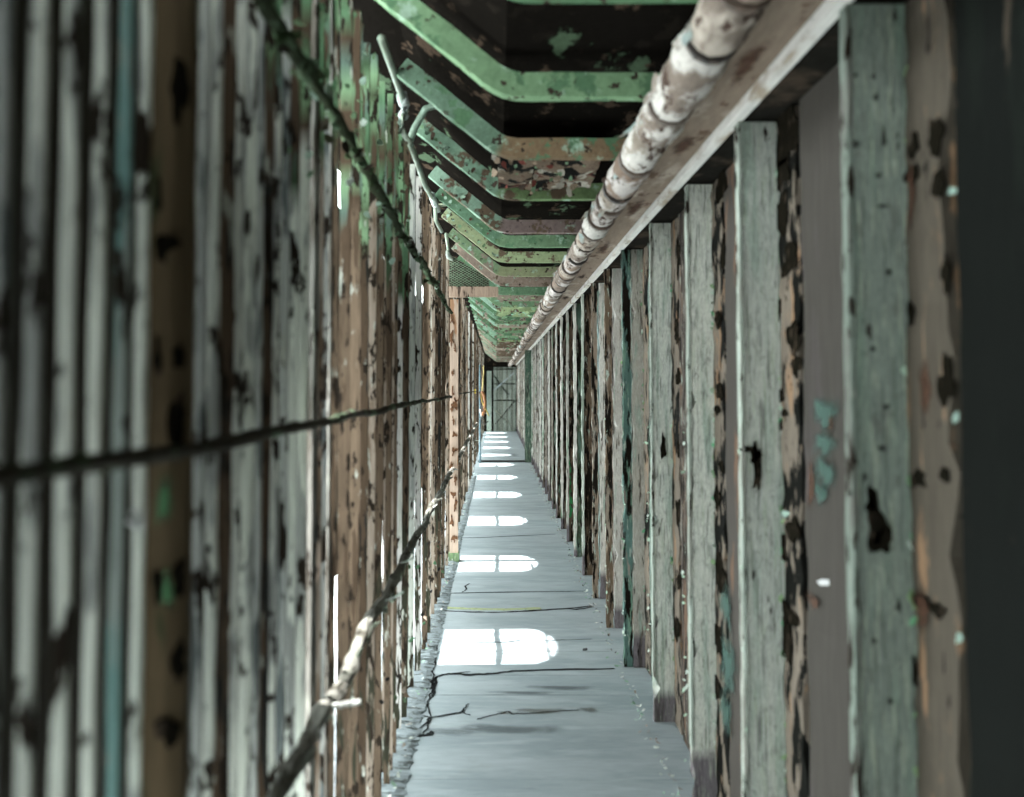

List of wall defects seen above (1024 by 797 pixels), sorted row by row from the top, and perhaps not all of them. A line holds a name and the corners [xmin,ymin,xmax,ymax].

peeling [464,154,600,197]
spalling [775,104,800,278]
spalling [903,117,957,200]
spalling [940,253,952,296]
spalling [777,296,804,379]
spalling [907,300,916,326]
spalling [777,377,789,431]
spalling [936,352,959,424]
spalling [906,467,950,488]
spalling [779,505,801,564]
crack [417,579,615,737]
spalling [778,594,799,665]